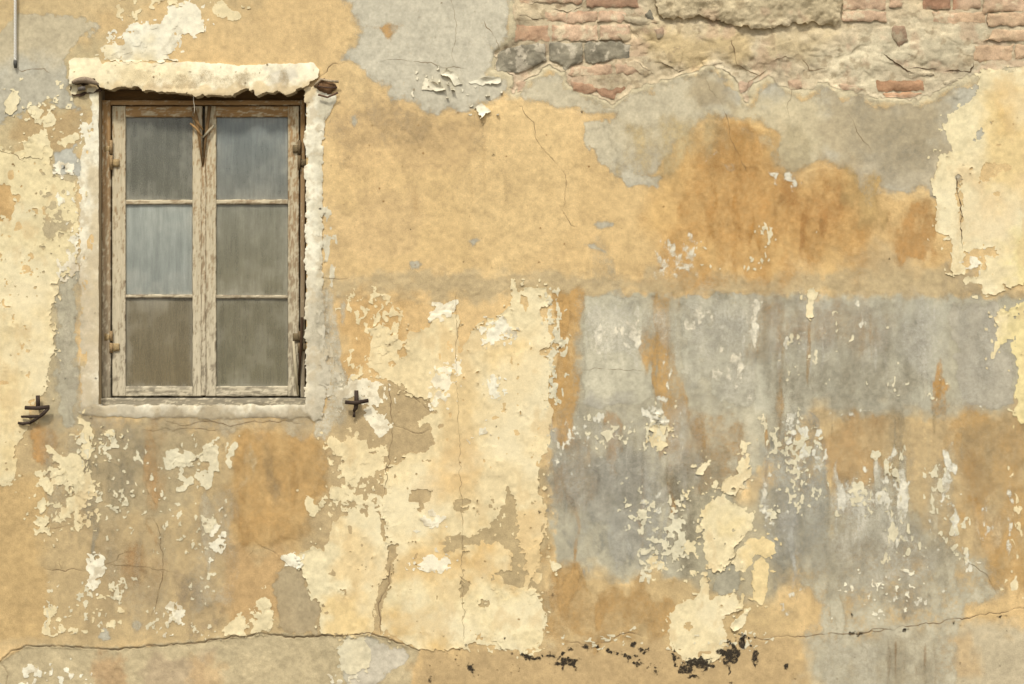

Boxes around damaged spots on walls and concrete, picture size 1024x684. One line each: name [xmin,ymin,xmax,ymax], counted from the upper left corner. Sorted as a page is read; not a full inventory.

peeling [0,0,683,684]
flaking render [340,0,1024,428]
crack [1,570,416,681]
peeling [617,407,829,668]
damp [538,283,1024,684]
peeling [834,445,928,619]
crack [758,562,1021,640]
peeling [922,464,981,563]